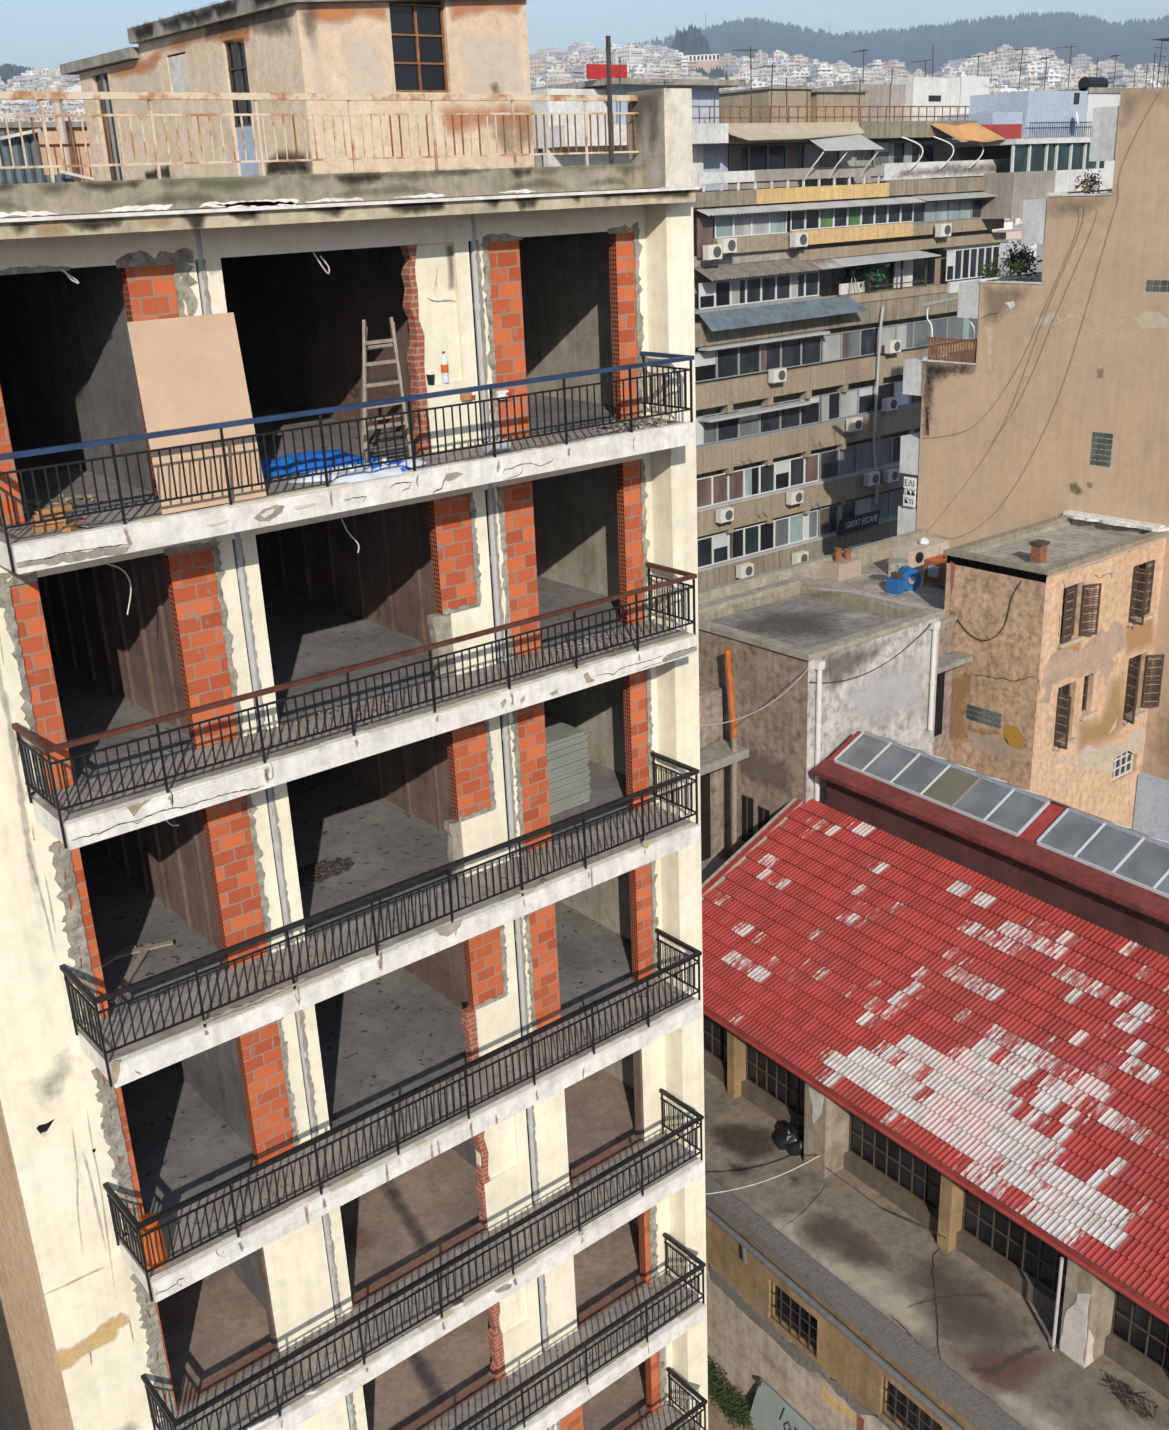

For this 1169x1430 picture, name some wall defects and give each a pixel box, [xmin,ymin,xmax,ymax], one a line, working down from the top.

flaking render [99,204,173,212]
flaking render [200,197,364,208]
flaking render [0,210,57,218]
peeling [1060,1293,1094,1368]